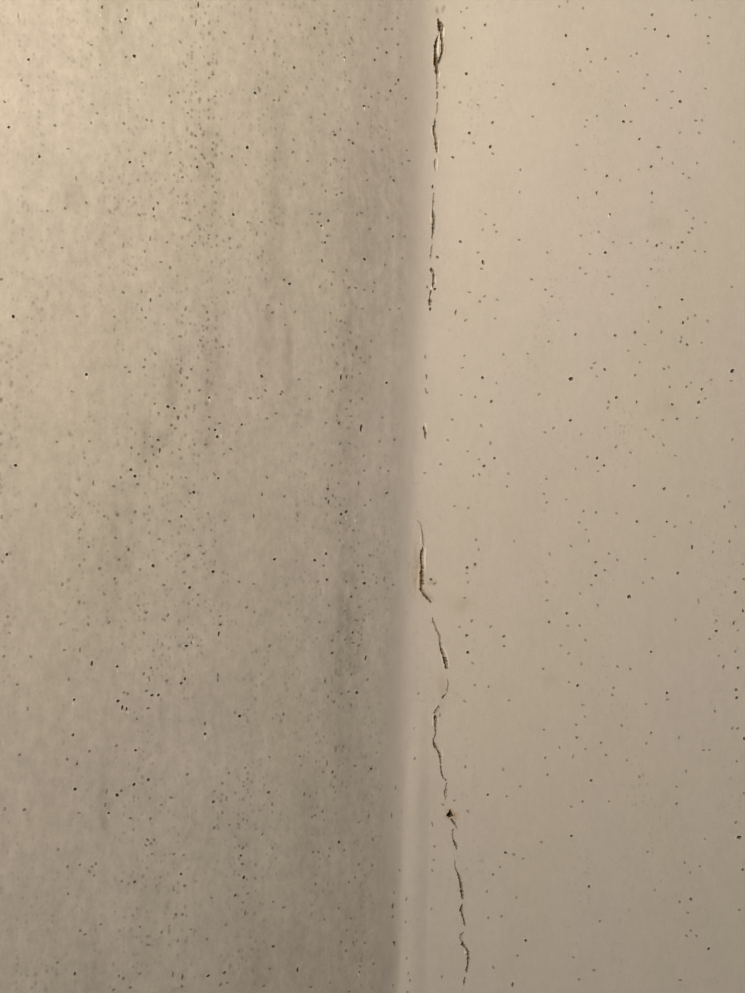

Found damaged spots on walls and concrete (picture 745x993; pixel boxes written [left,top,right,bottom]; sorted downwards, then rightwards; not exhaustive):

crack [428,75,439,305]
crack [417,520,470,984]